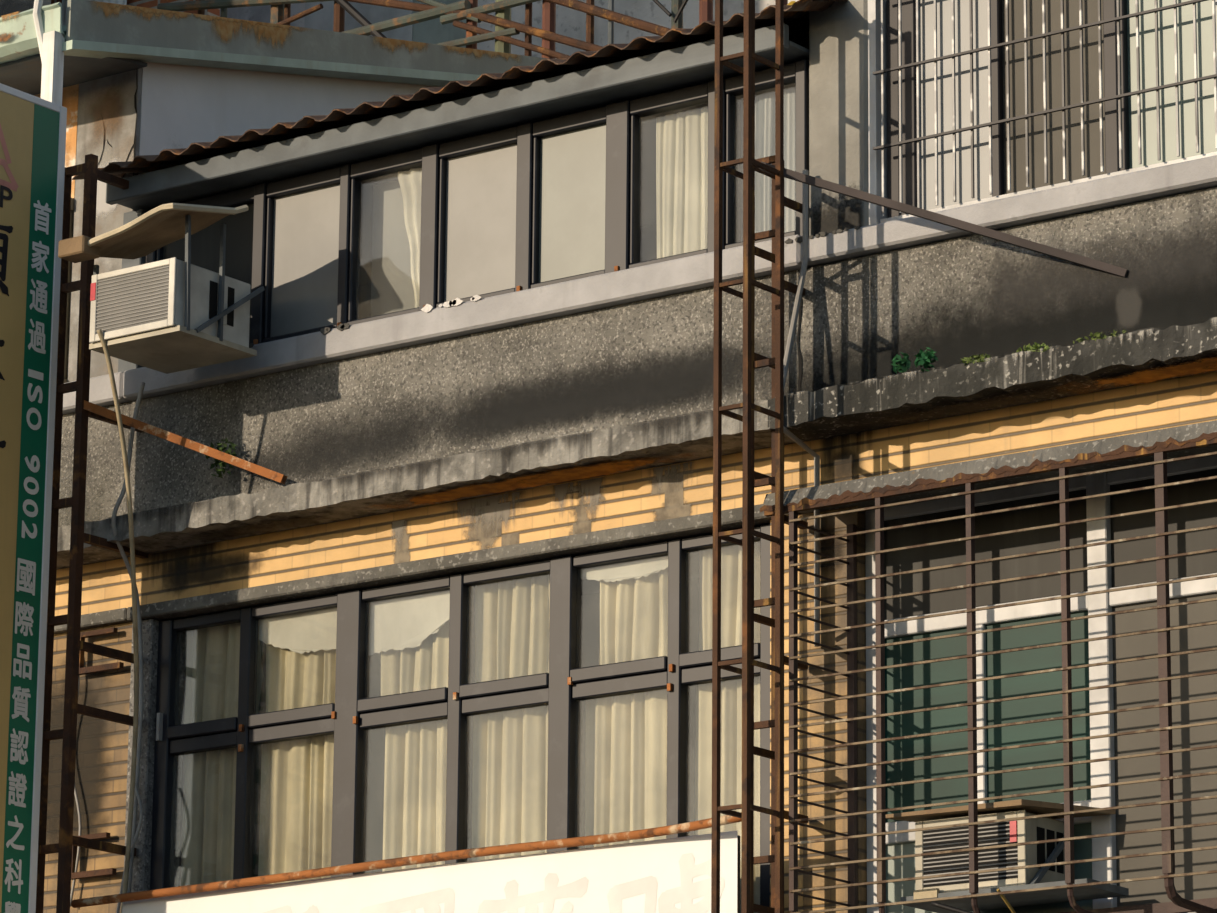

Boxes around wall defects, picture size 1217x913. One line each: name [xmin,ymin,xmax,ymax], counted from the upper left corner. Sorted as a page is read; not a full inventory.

corrosion [0,11,18,42]
corrosion [97,1,300,45]
water stain [812,196,862,237]
water stain [788,238,1217,395]
water stain [250,351,743,485]
water stain [823,431,871,480]
water stain [410,459,665,505]
water stain [148,517,326,591]
water stain [820,531,841,571]